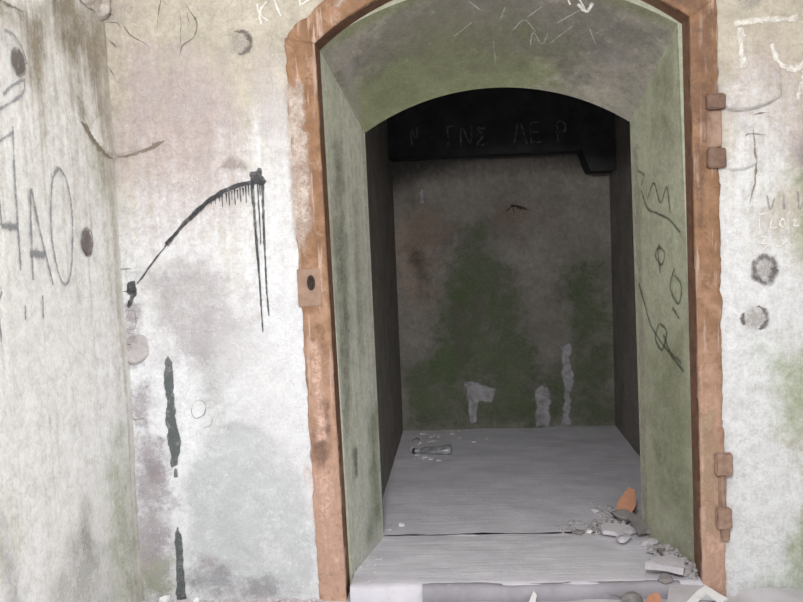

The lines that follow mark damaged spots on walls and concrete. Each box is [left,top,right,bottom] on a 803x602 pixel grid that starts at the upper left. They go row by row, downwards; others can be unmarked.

rust [310,342,340,575]